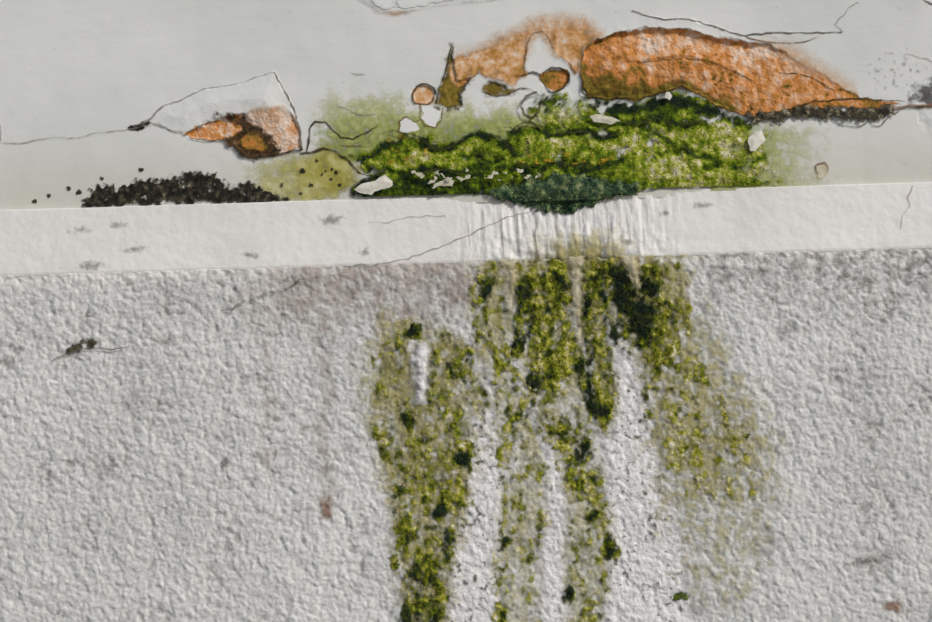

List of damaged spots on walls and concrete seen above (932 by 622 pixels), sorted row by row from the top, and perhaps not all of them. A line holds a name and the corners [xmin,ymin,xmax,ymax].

peeling [371,0,448,9]
crack [632,2,859,44]
flaking render [128,72,303,160]
crack [884,103,932,119]
damp [909,82,932,104]
damp [67,168,289,207]
damp [501,204,639,339]
damp [408,340,430,404]
damp [444,405,510,622]
damp [535,395,572,622]
damp [601,356,694,622]